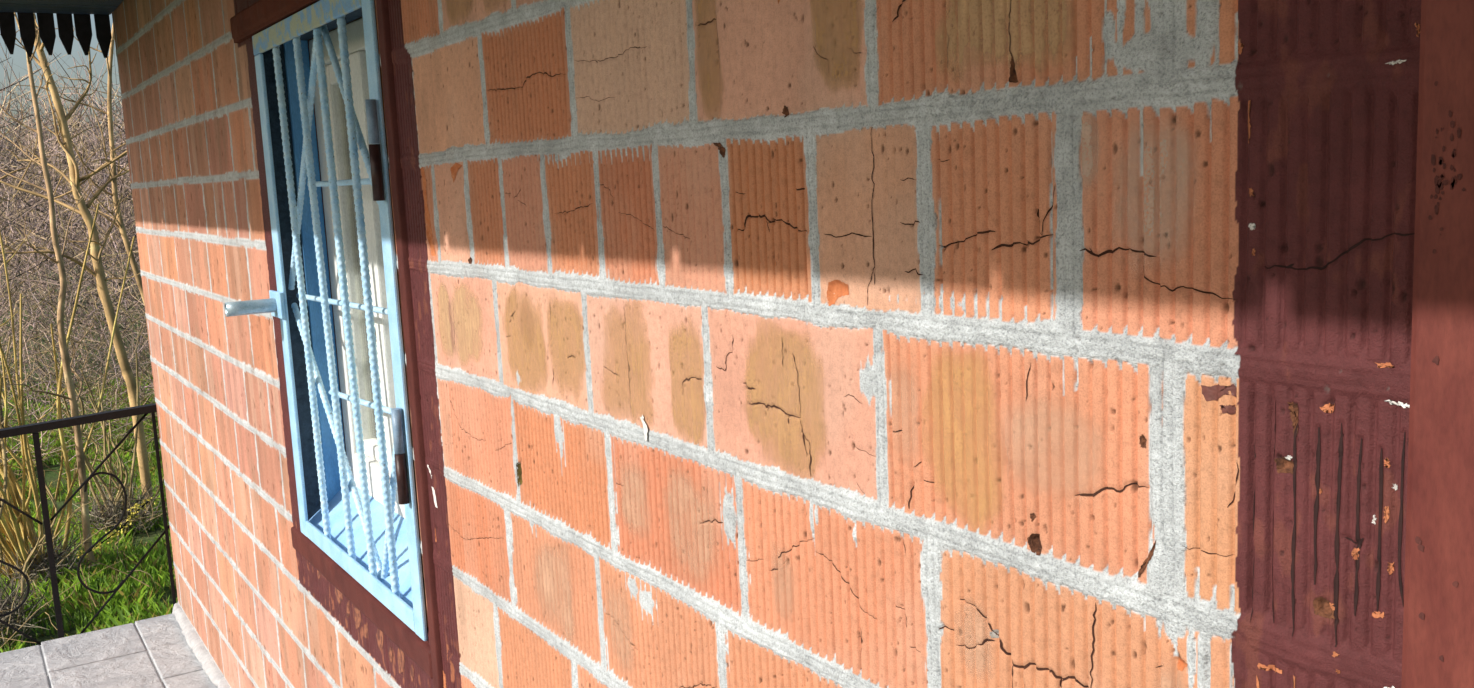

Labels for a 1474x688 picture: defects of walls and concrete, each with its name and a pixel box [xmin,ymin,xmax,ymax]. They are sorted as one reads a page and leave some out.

crack [490,46,647,101]
crack [736,127,1235,306]
spalling [827,280,849,306]
damp [506,295,583,385]
damp [672,331,703,443]
crack [682,340,812,475]
damp [746,334,820,466]
peeling [1320,403,1335,413]
peeling [1371,457,1398,524]
crack [746,538,1096,688]
spalling [1313,597,1335,619]
peeling [1256,663,1295,688]